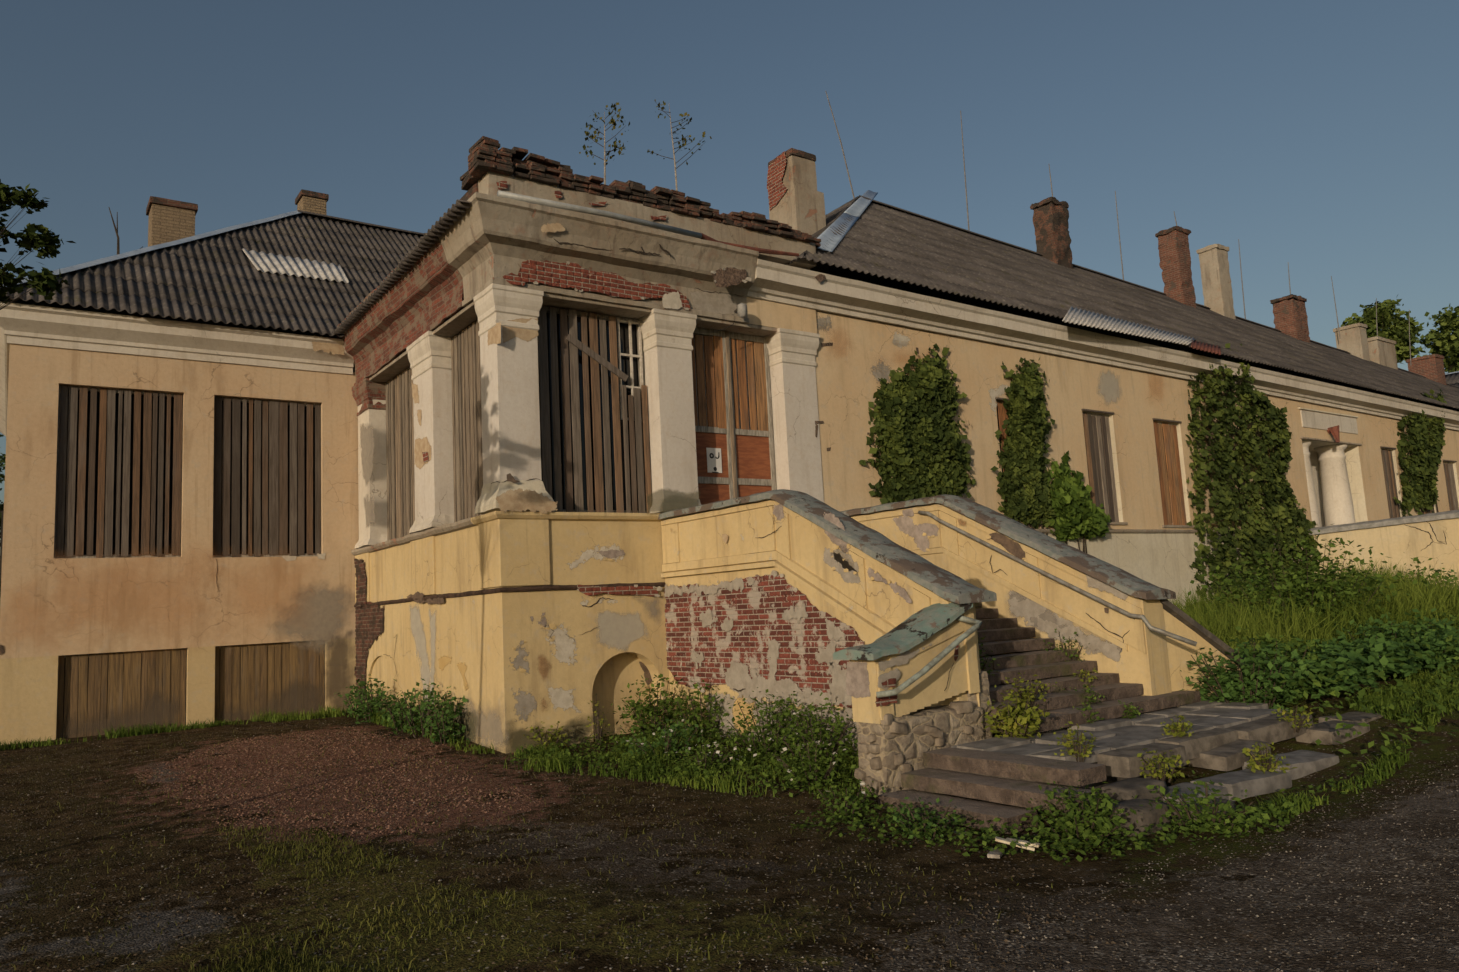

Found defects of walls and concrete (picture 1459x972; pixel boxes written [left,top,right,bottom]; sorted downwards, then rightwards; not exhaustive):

flaking render [503,259,737,315]
flaking render [565,543,625,570]
flaking render [823,513,912,604]
flaking render [0,558,1063,972]